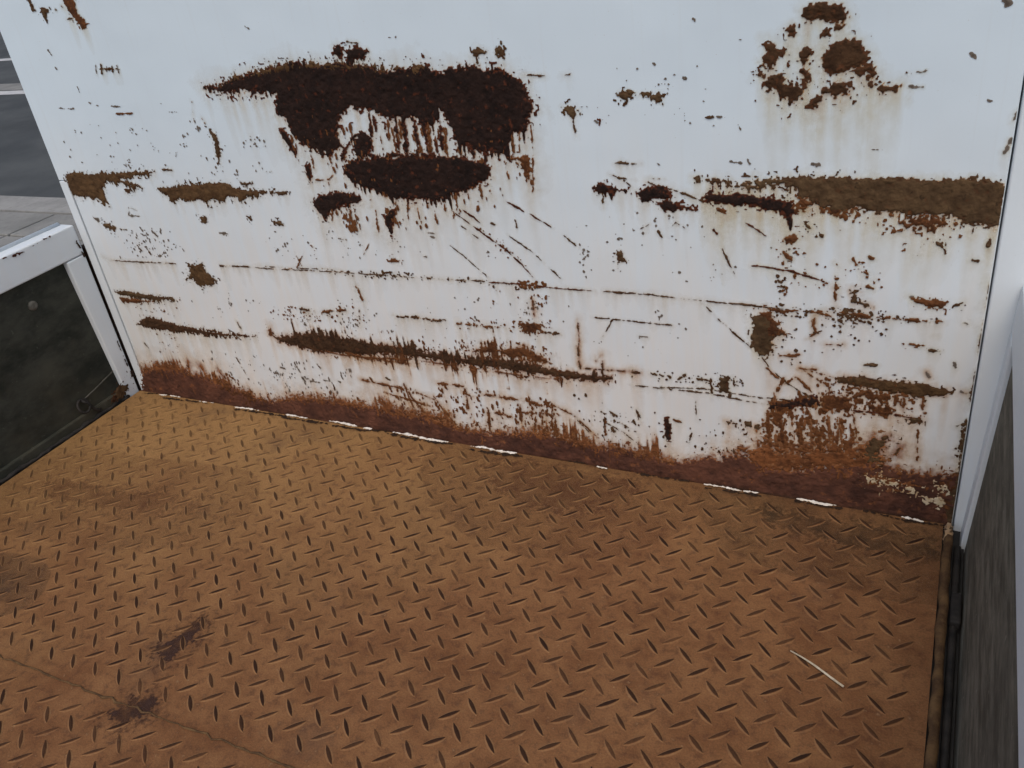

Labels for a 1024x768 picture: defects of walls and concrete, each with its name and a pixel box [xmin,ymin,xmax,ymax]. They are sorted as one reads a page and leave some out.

corrosion [63,118,291,208]
corrosion [201,40,545,243]
corrosion [750,2,902,119]
corrosion [111,161,1005,528]